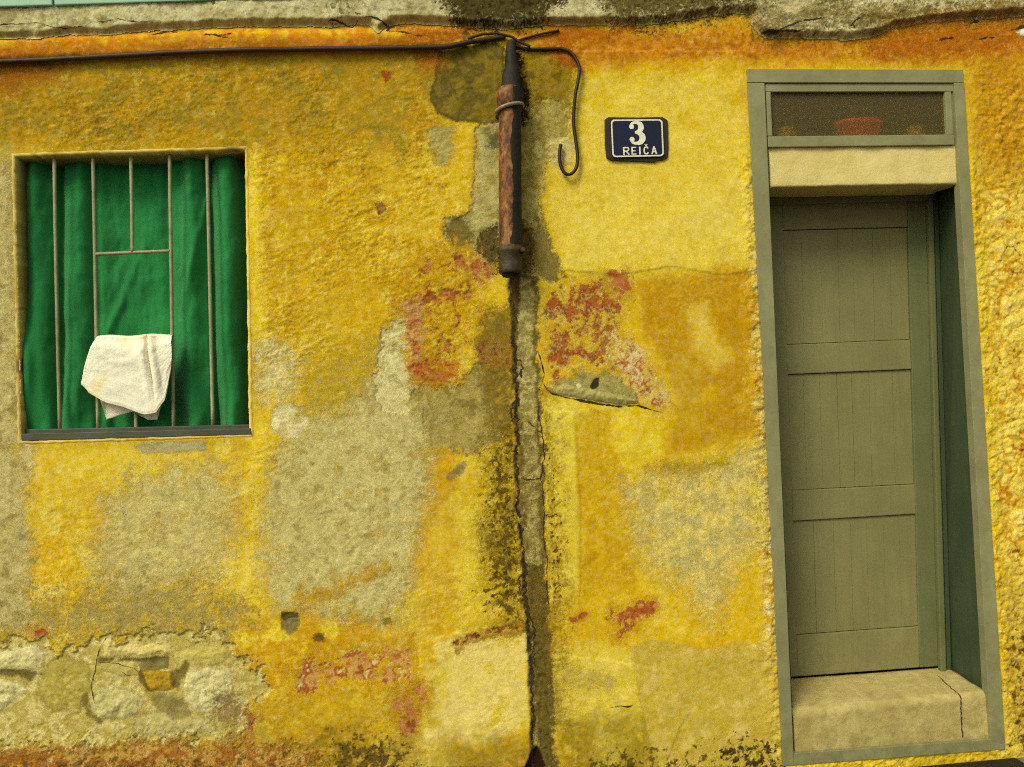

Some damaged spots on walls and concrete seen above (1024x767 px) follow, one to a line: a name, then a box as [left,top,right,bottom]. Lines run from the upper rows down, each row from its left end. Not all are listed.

water stain [430,0,576,148]
water stain [446,215,499,276]
peeling [521,97,674,419]
flaking render [0,120,526,756]
water stain [472,425,568,767]
crack [509,279,660,767]